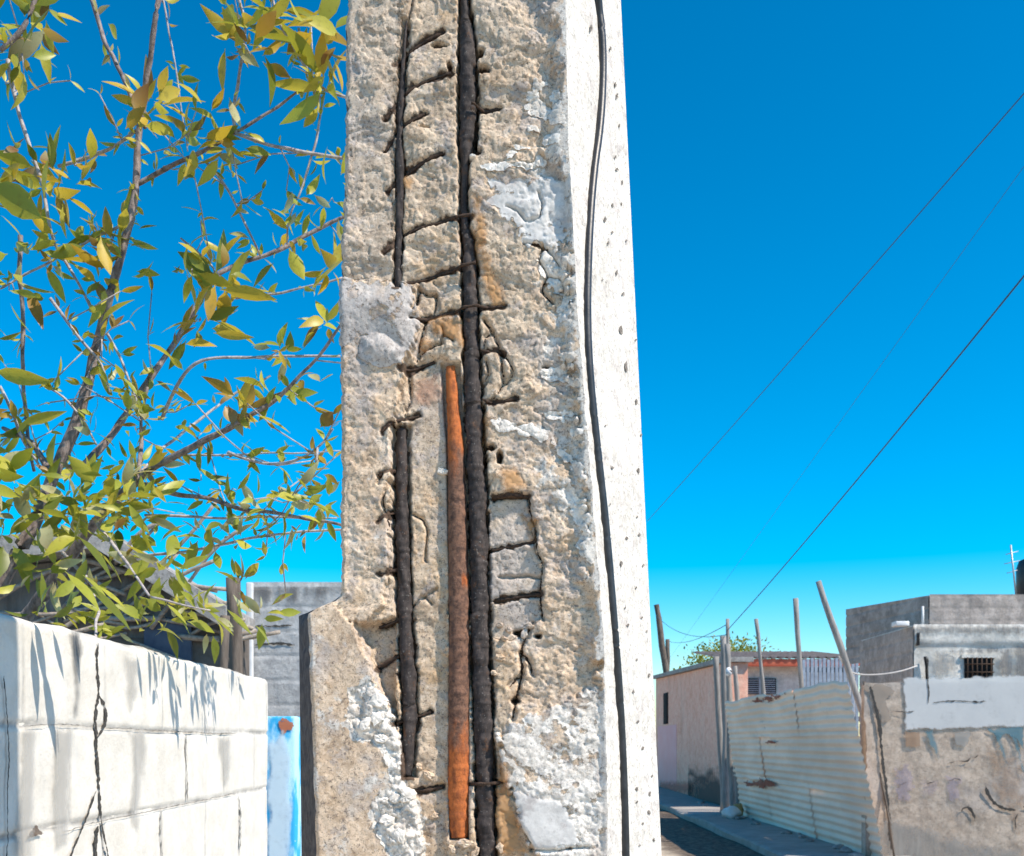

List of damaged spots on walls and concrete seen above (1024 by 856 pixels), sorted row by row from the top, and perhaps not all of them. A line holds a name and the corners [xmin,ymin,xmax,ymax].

rust [382,27,445,153]
crack [531,243,551,302]
rust [375,411,421,595]
spalling [340,0,608,856]
rust [477,333,531,534]
crack [3,643,242,856]
rust [375,620,445,796]
rust [487,590,544,716]
crack [510,500,543,720]
rust [744,778,775,789]
crack [870,657,984,849]